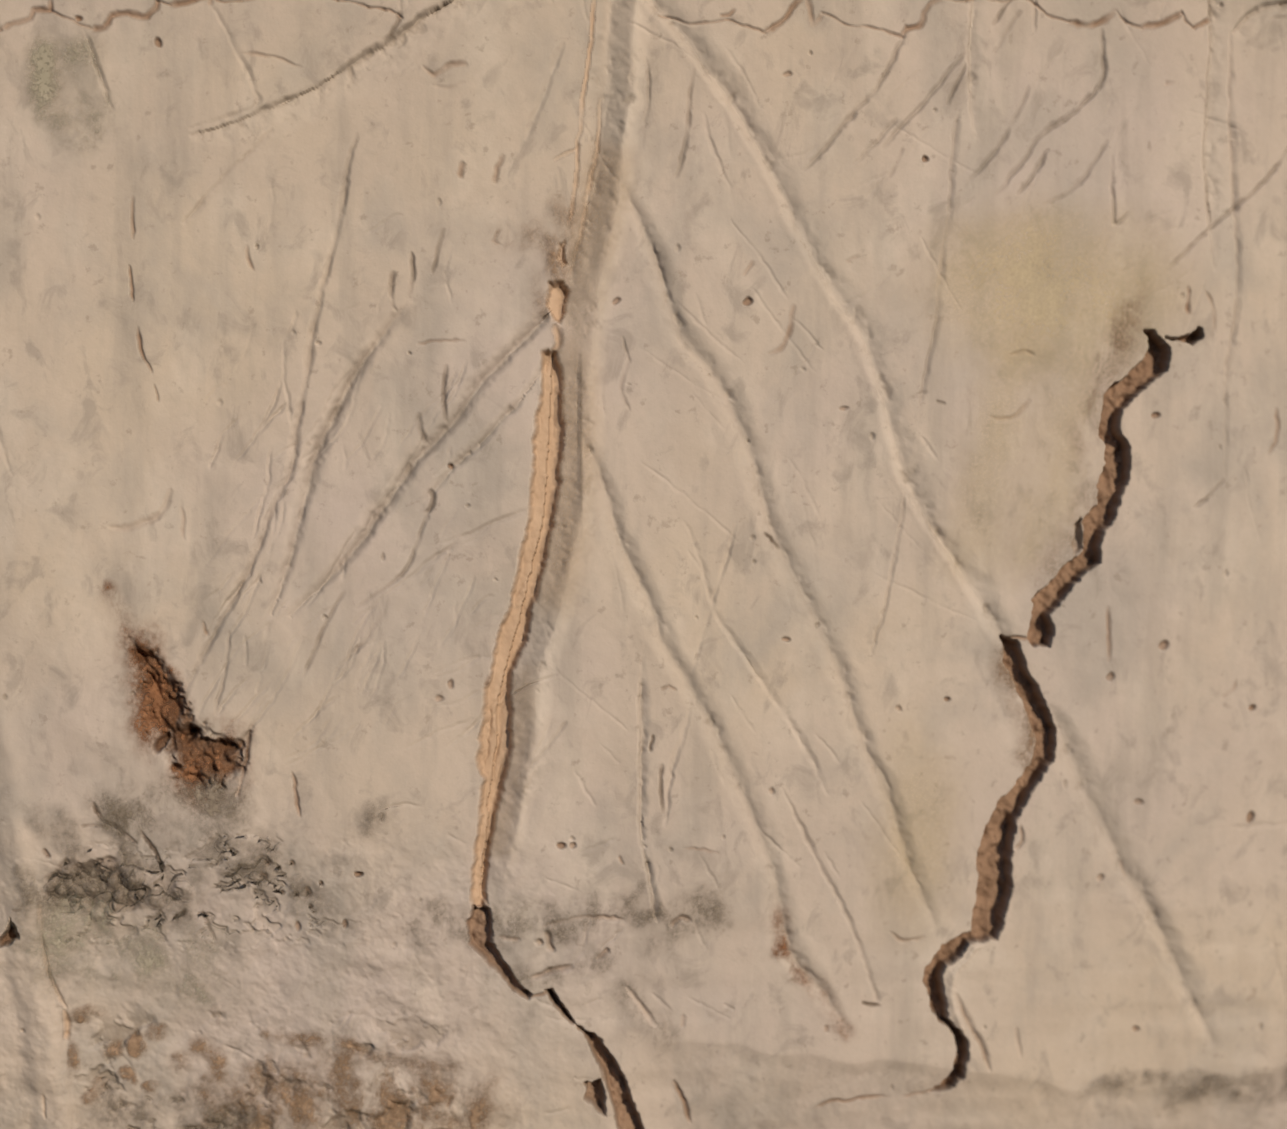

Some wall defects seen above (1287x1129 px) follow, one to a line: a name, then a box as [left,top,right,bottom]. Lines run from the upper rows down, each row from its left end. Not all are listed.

crack [0,0,254,32]
crack [333,0,404,20]
crack [657,0,1210,39]
crack [243,51,302,68]
crack [465,0,644,1129]
spalling [126,634,253,792]
crack [816,287,1203,1109]
crack [624,986,658,1028]
crack [672,1080,692,1124]